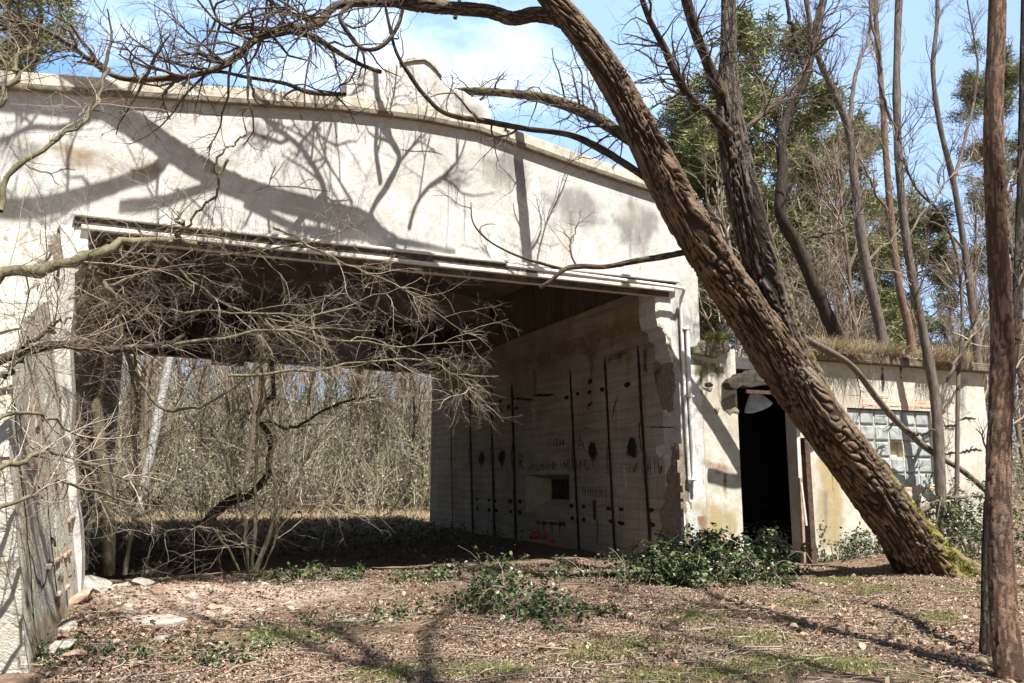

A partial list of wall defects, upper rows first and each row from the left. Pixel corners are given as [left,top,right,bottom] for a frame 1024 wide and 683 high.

water stain [621,213,656,241]
flaking render [860,394,930,410]
spalling [655,437,692,554]